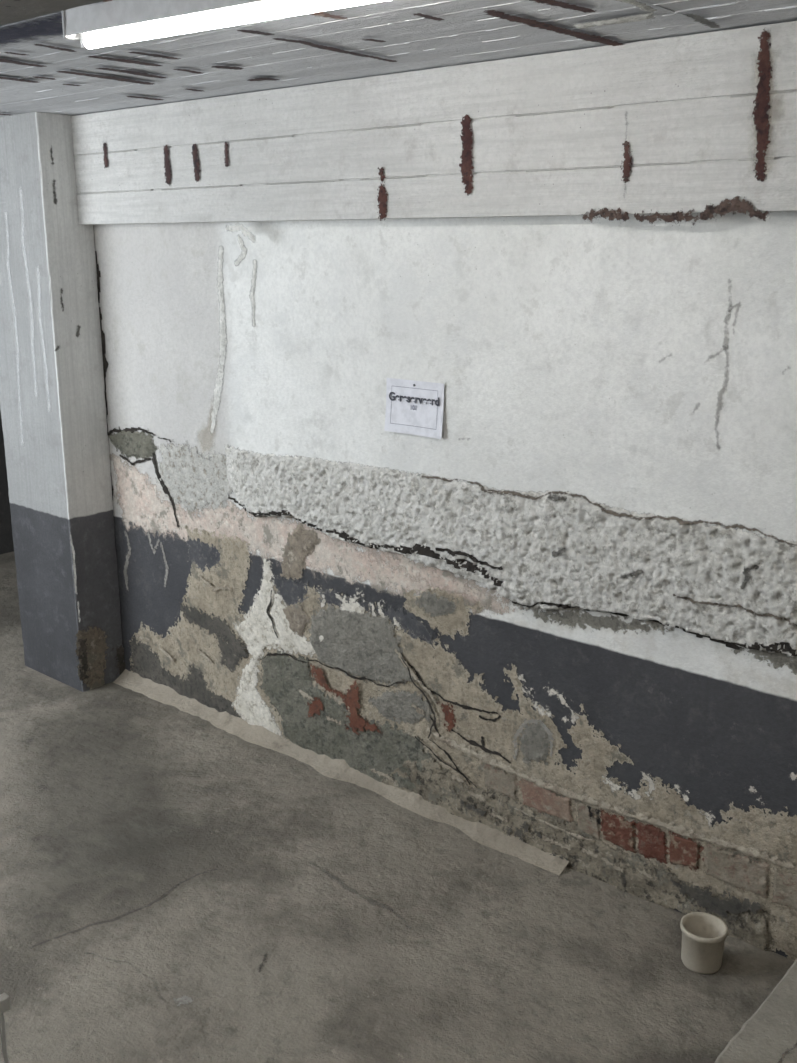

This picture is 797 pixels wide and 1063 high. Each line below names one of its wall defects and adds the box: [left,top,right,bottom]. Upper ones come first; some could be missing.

corrosion [484,10,625,46]
corrosion [529,0,597,13]
corrosion [0,44,280,100]
corrosion [752,29,773,182]
corrosion [163,145,172,186]
corrosion [192,144,201,182]
corrosion [459,114,474,195]
corrosion [377,167,388,221]
peeling [70,426,797,962]